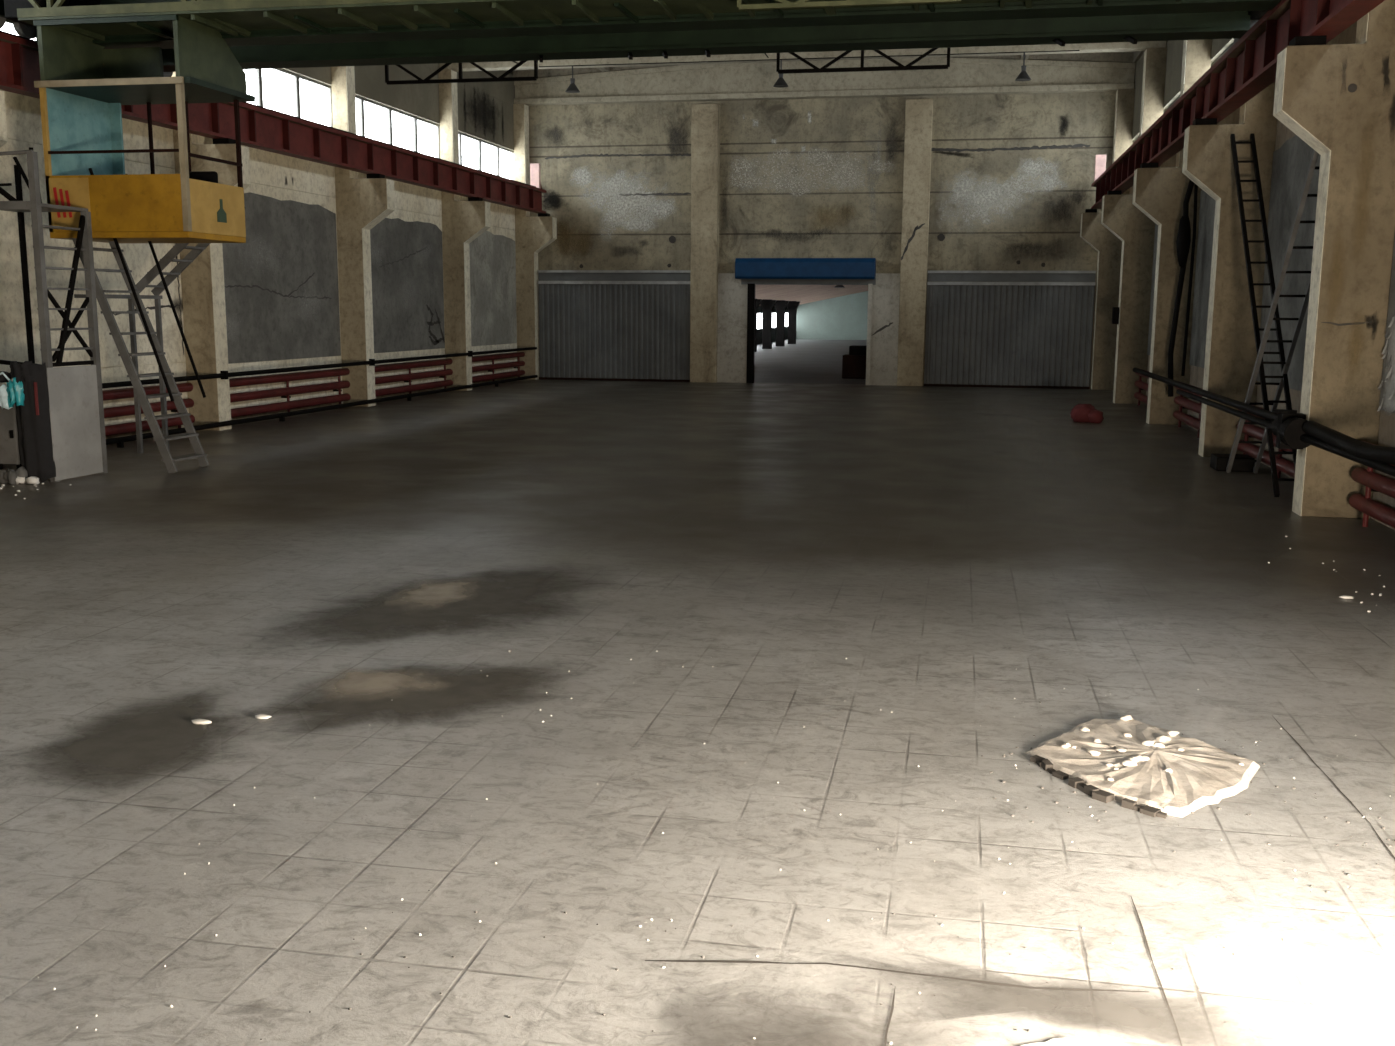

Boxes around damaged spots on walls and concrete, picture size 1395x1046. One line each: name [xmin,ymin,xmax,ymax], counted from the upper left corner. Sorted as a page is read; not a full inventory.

peeling [1378,317,1395,412]
damp [408,585,461,602]
damp [271,667,549,729]
spalling [1030,755,1167,819]
crack [1274,718,1395,859]